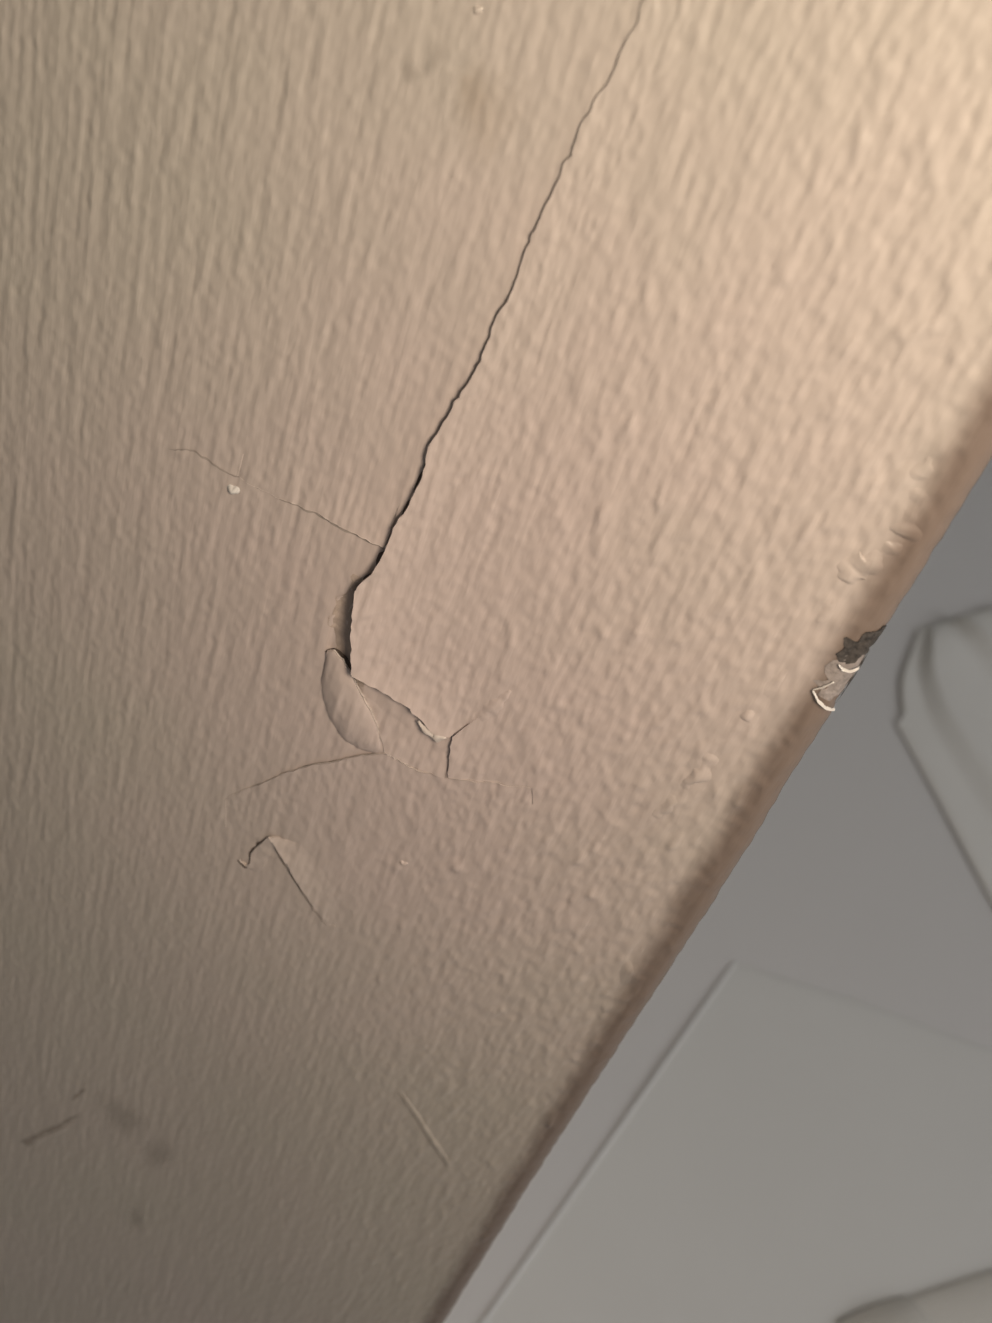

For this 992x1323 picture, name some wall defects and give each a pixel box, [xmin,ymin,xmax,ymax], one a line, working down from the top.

peeling [321,0,707,783]
peeling [812,625,887,711]